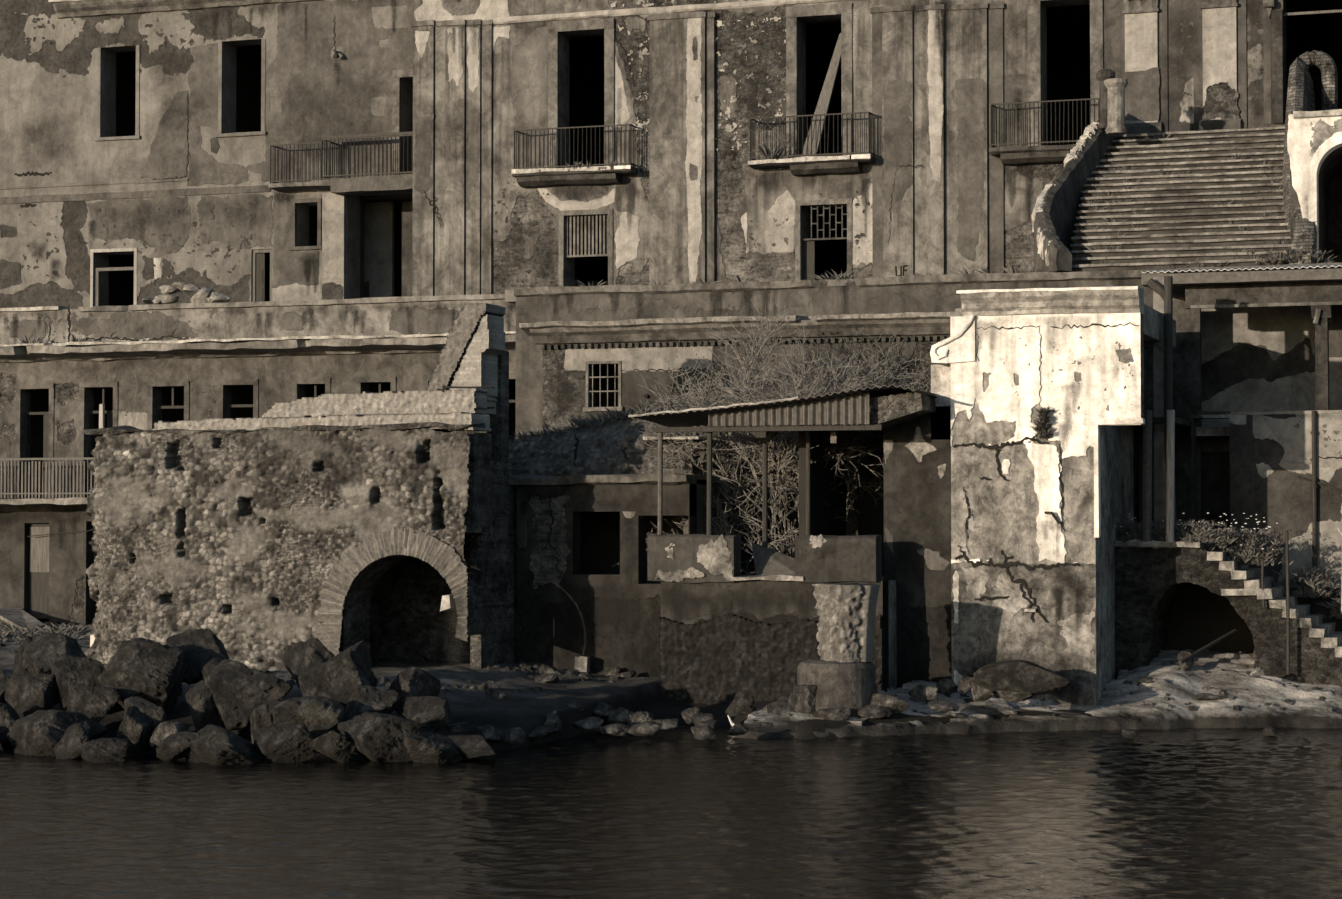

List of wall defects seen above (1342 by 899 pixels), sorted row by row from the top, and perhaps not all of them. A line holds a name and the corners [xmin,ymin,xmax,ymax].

peeling [0,0,820,343]
peeling [852,79,913,279]
peeling [927,0,986,261]
peeling [1003,74,1028,146]
spalling [1123,67,1160,121]
spalling [1179,44,1264,124]
peeling [1310,118,1342,157]
spalling [517,492,734,693]
spalling [881,362,1096,705]
crack [953,322,1139,623]
spalling [1114,305,1342,549]
spalling [1217,413,1342,587]